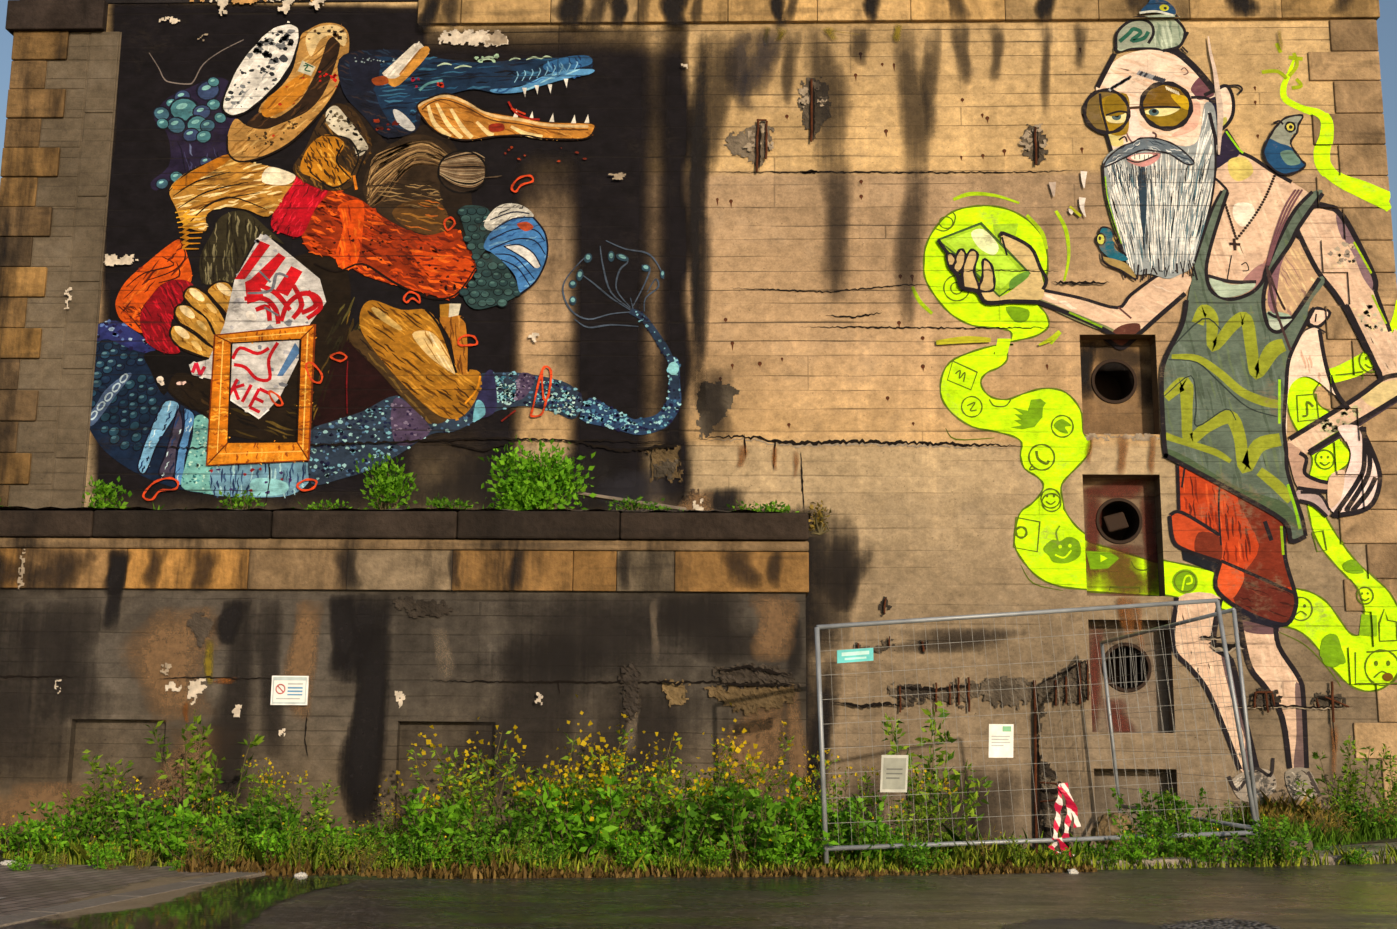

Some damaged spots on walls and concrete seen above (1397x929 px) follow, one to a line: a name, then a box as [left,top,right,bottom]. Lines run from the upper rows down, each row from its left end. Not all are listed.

peeling [190,0,324,16]
leakage [1226,0,1258,17]
leakage [993,28,1004,71]
leakage [1035,0,1055,102]
peeling [105,254,138,266]
crack [113,443,207,451]
leakage [534,454,661,510]
crack [310,435,1016,513]
leakage [679,488,742,511]
leakage [133,552,390,822]
leakage [475,511,865,822]
spalling [834,659,1091,853]